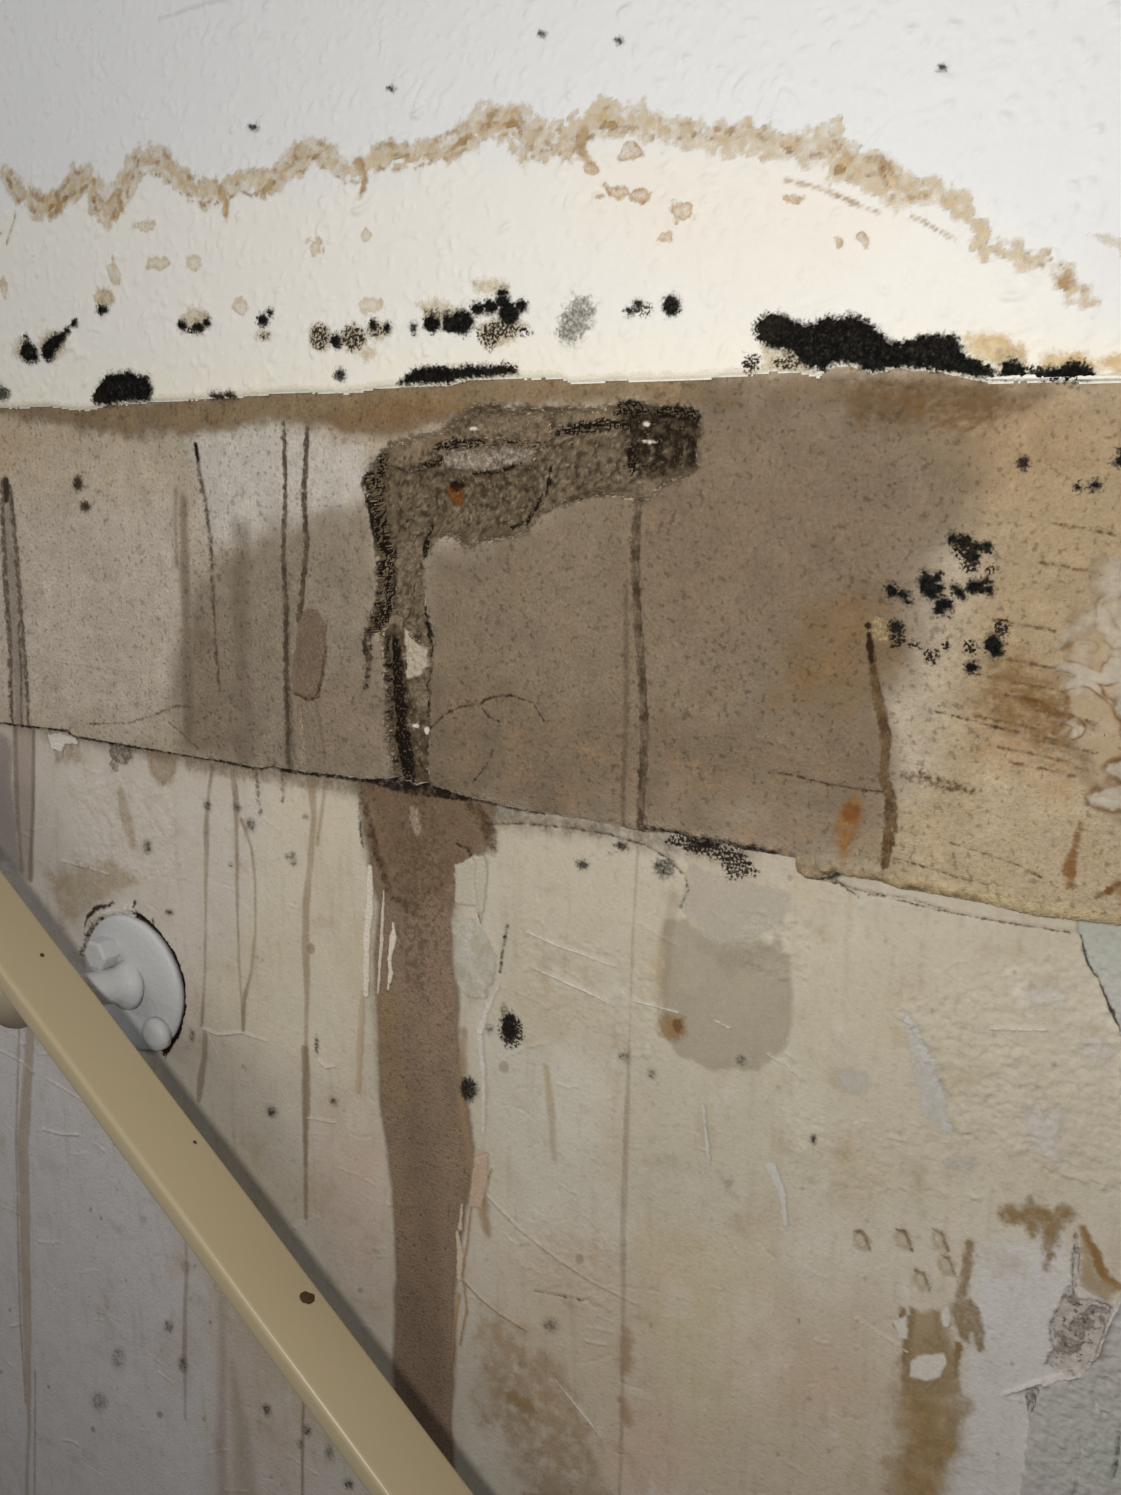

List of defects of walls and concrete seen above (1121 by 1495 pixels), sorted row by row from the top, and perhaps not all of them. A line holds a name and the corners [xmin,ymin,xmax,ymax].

water stain [1,95,1044,270]
water stain [94,265,120,316]
water stain [1056,270,1096,306]
peeling [48,732,78,753]
crack [0,705,687,899]
crack [439,694,543,722]
water stain [0,279,1121,1467]
spalling [646,827,980,900]
peeling [356,865,396,1093]
peeling [452,855,499,1357]
peeling [299,1291,315,1304]
peeling [1045,1232,1112,1376]